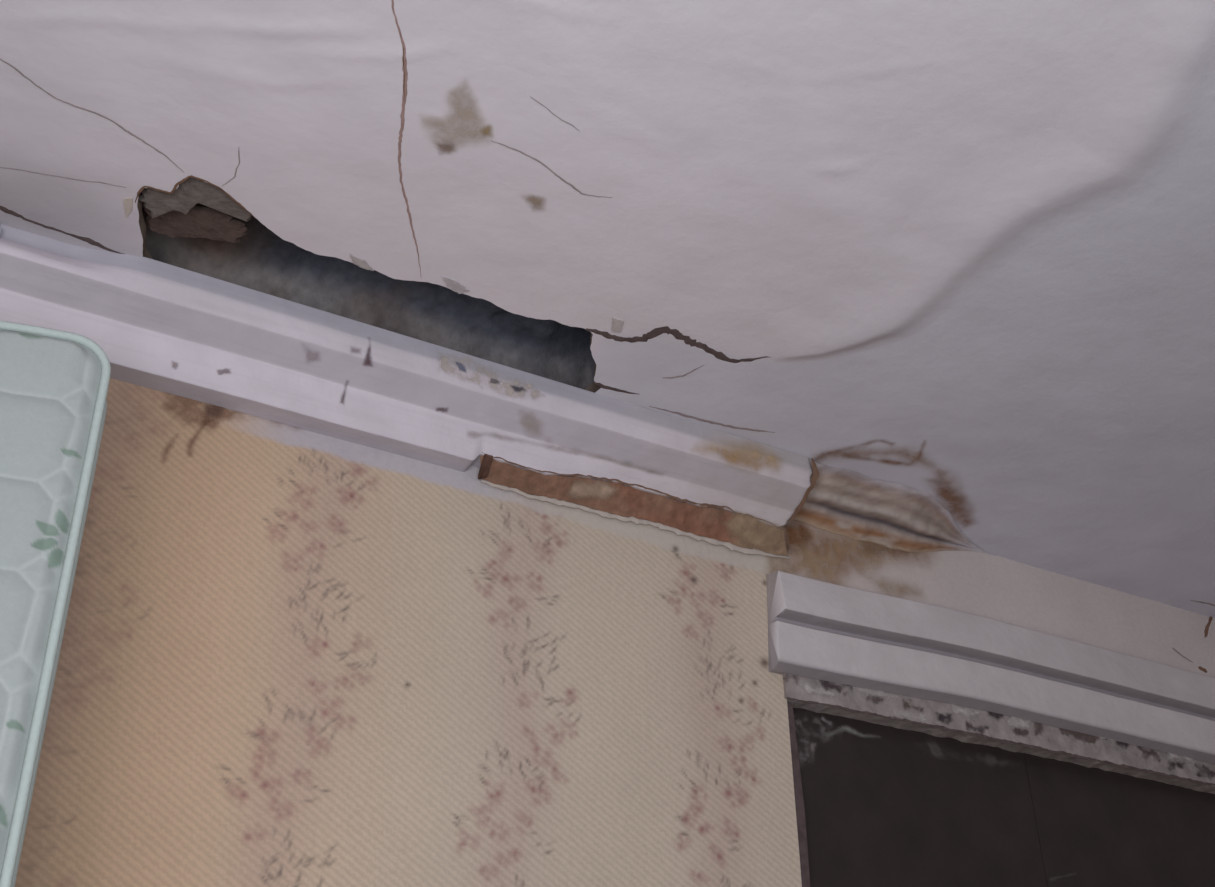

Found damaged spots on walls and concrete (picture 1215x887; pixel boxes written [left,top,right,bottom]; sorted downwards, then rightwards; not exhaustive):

crack [0,59,184,172]
crack [392,0,421,274]
crack [530,96,580,131]
crack [224,149,240,185]
crack [491,140,612,198]
crack [0,206,123,254]
spalling [123,192,595,398]
crack [586,326,768,379]
crack [650,406,775,433]
flaking render [478,452,996,559]
leakage [785,525,908,580]
crack [1172,600,1215,673]